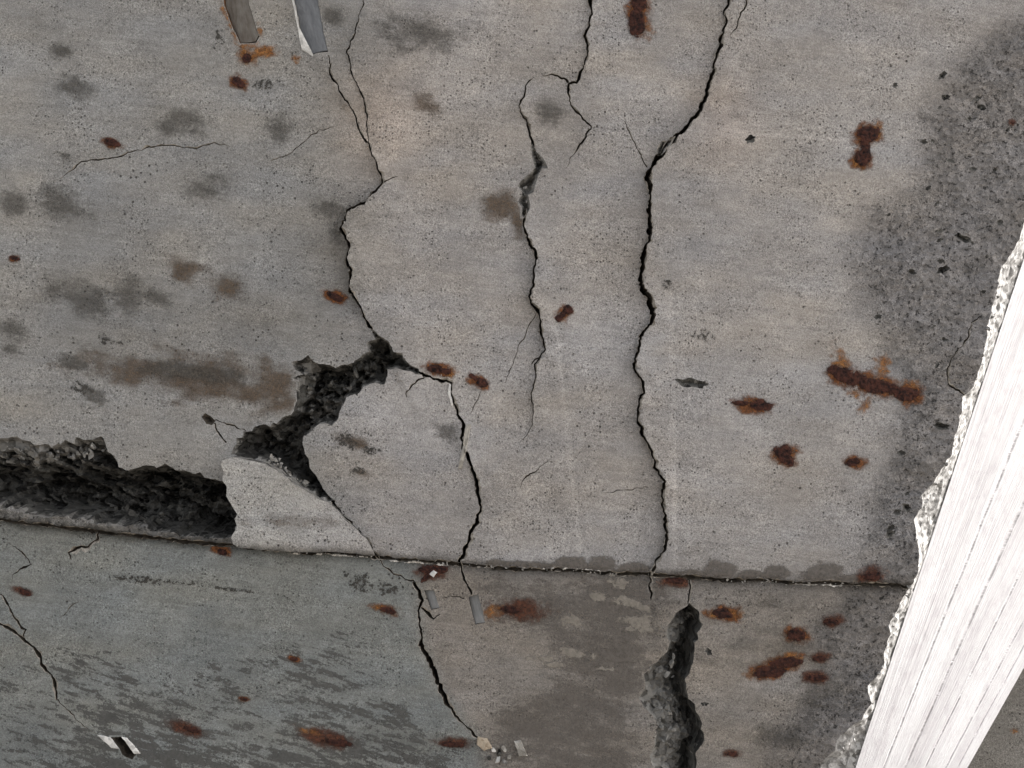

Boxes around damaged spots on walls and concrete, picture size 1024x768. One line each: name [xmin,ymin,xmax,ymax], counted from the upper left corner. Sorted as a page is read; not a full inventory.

crack [271,0,398,329]
crack [519,0,594,169]
corrosion [625,0,651,38]
corrosion [848,121,883,170]
spalling [0,436,237,539]
spalling [231,329,419,502]
crack [331,371,483,738]
crack [605,0,748,600]
corrosion [731,396,774,415]
corrosion [826,349,924,412]
spalling [639,603,712,768]
corrosion [746,625,831,683]